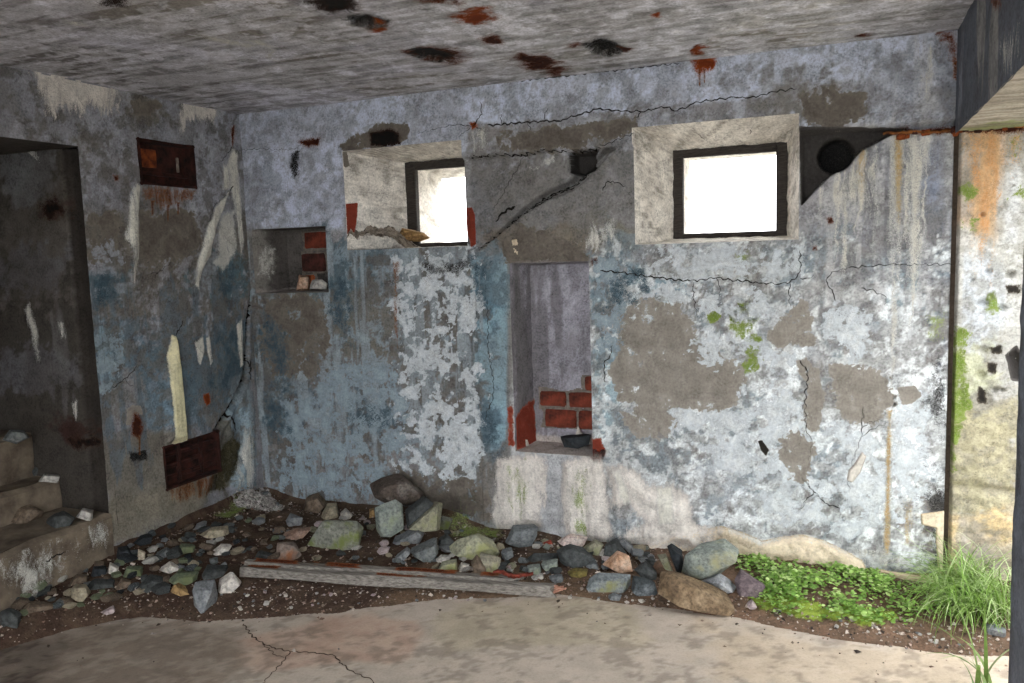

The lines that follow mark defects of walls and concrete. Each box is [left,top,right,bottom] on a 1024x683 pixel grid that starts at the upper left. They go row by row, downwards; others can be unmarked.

spalling [404,47,455,63]
corrosion [399,0,583,77]
corrosion [136,137,198,220]
peeling [339,122,410,168]
crack [422,63,795,249]
corrosion [883,123,1024,140]
crack [601,251,954,314]
water stain [807,121,937,395]
peeling [256,203,493,523]
corrosion [162,429,222,502]
peeling [591,256,944,570]
crack [791,361,886,509]